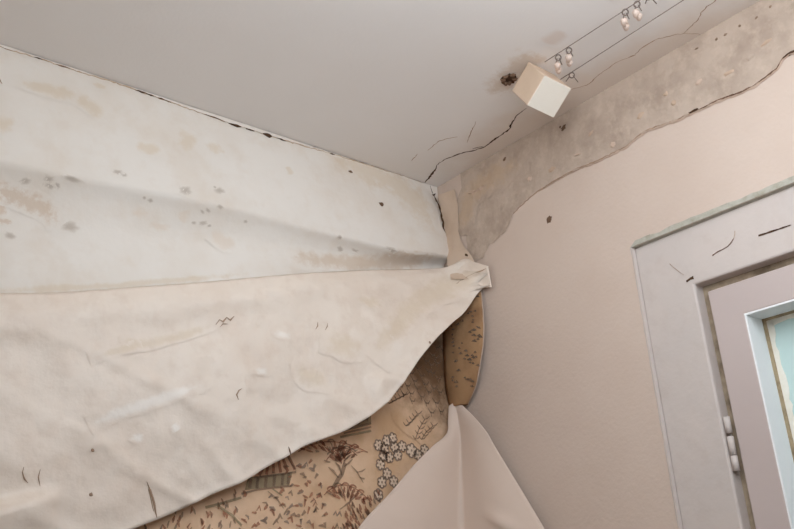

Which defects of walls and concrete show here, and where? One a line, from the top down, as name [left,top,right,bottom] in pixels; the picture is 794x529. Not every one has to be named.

peeling [16,173,86,191]
crack [0,46,525,231]
damp [279,0,760,374]
spalling [460,0,794,262]